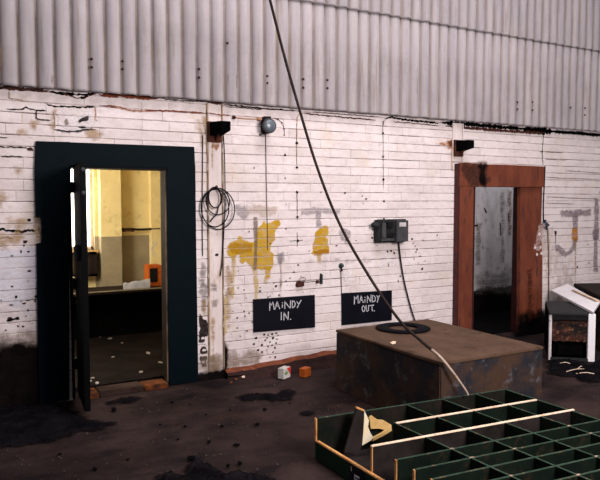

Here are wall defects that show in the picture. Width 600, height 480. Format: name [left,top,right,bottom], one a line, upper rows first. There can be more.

crack [0,85,600,202]